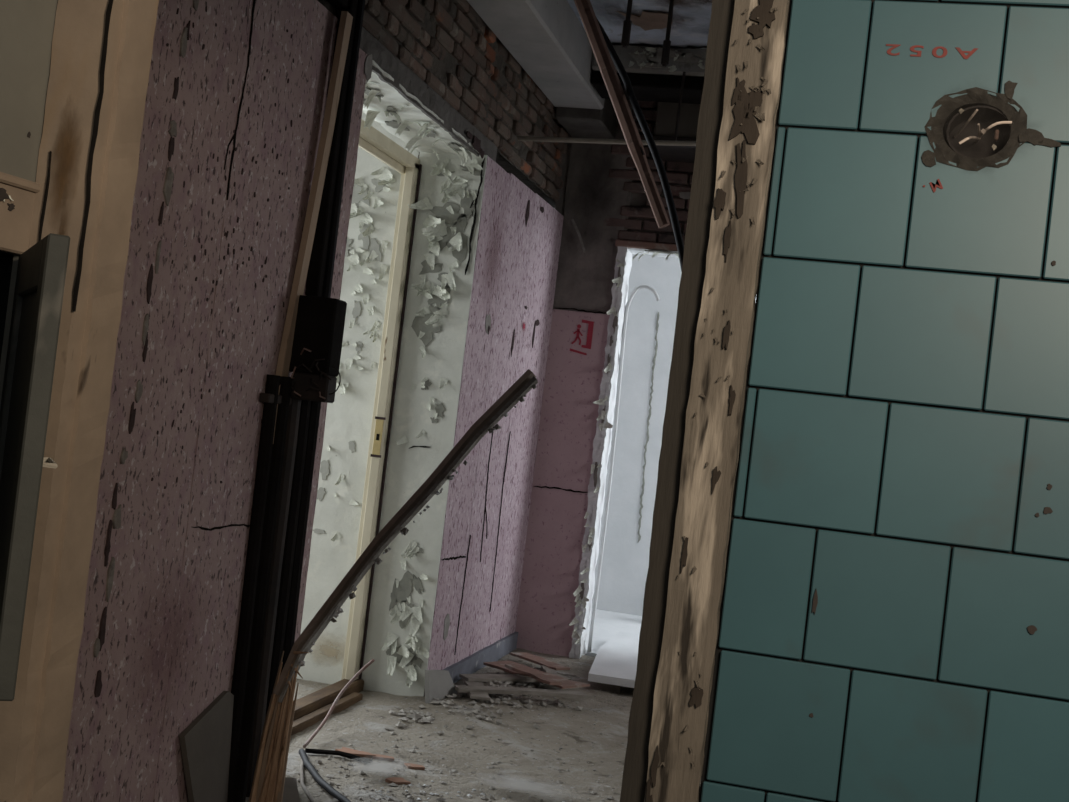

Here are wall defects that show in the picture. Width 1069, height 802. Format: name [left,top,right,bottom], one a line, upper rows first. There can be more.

crack [224,0,256,200]
spalling [921,81,1061,171]
peeling [363,54,485,359]
peeling [336,167,396,395]
peeling [604,306,618,373]
peeling [593,396,613,431]
crack [534,485,588,493]
peeling [591,462,600,493]
crack [441,426,511,655]
peeling [582,512,595,553]
peeling [569,567,590,644]